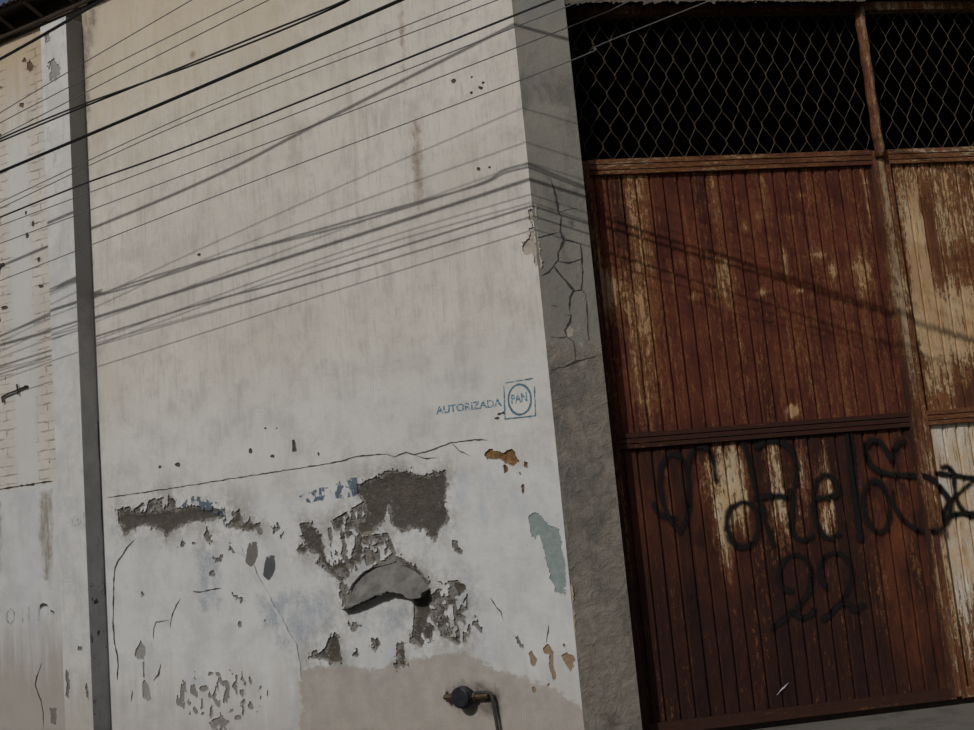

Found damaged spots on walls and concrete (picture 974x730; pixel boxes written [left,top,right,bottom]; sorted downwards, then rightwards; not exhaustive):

peeling [523,204,543,268]
crack [537,180,596,370]
spalling [118,496,284,576]
crack [98,421,484,699]
spalling [298,469,483,669]
peeling [177,672,262,730]